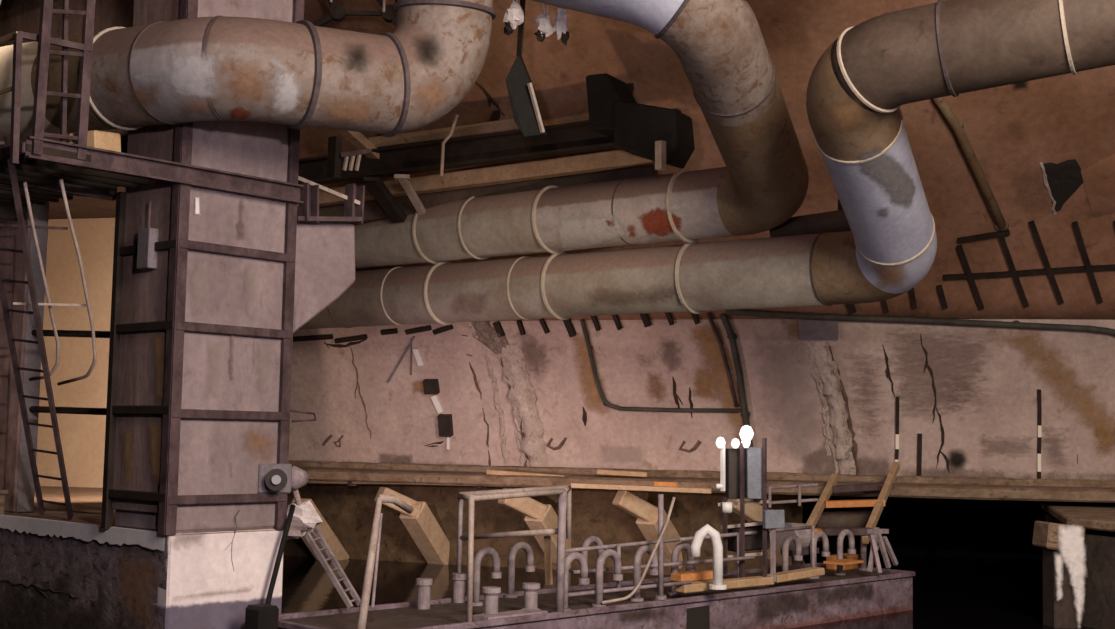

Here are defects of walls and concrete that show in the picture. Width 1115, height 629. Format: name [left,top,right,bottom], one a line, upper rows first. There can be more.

spalling [1039,159,1083,215]
crack [324,339,371,432]
crack [462,335,491,466]
crack [882,345,895,396]
crack [920,334,950,474]